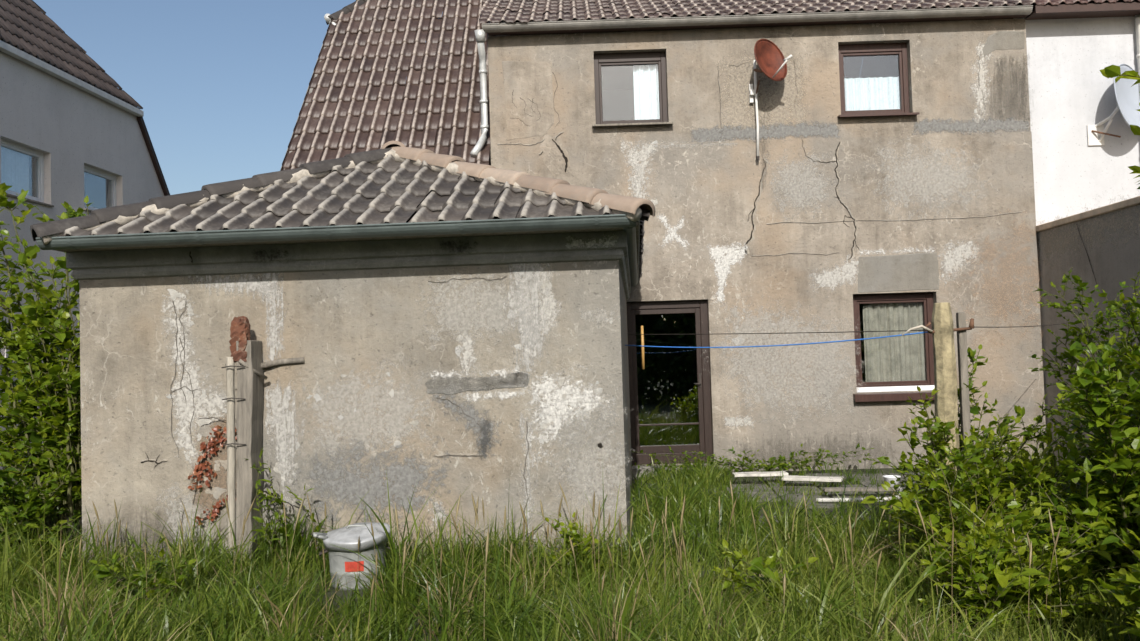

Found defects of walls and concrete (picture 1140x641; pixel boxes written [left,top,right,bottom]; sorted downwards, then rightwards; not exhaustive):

crack [512,72,563,155]
crack [744,158,768,254]
crack [794,63,859,262]
peeling [709,242,748,302]
peeling [455,334,477,372]
peeling [161,289,237,511]
peeling [529,372,615,461]